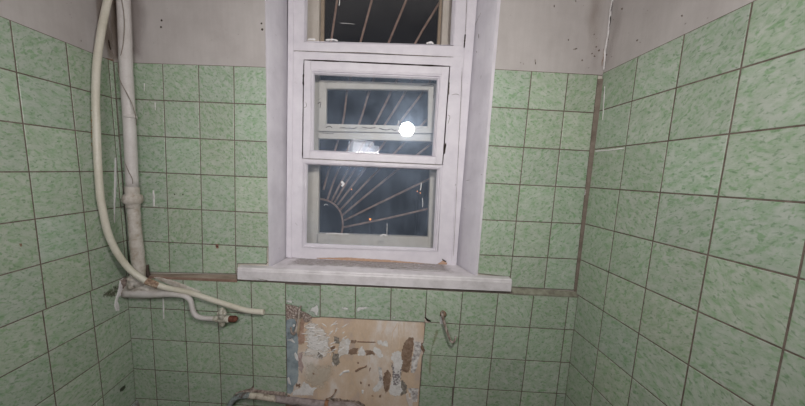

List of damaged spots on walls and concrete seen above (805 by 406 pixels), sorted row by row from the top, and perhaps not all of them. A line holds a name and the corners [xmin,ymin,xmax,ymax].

peeling [285,304,443,406]